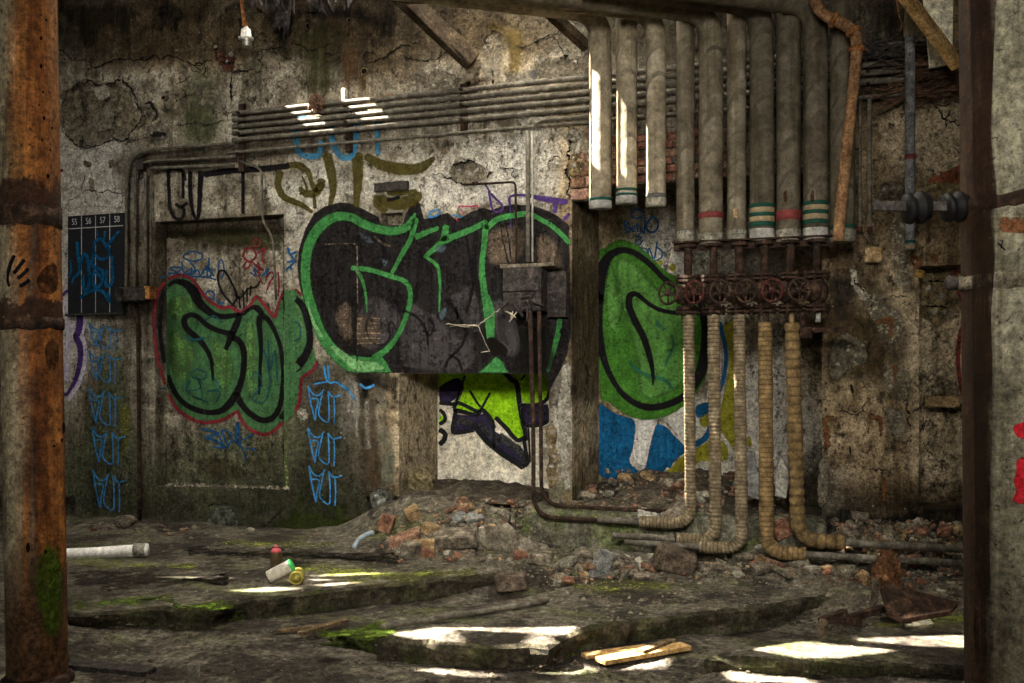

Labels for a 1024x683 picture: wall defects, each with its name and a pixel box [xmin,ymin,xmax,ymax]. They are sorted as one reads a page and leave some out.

crack [58,41,447,126]
spalling [38,77,172,212]
spalling [450,159,487,184]
flaking render [564,127,590,202]
flaking render [637,134,646,183]
flaking render [666,132,677,181]
rust [0,201,63,230]
rust [37,263,58,294]
rust [0,316,65,370]
leakage [826,500,963,533]